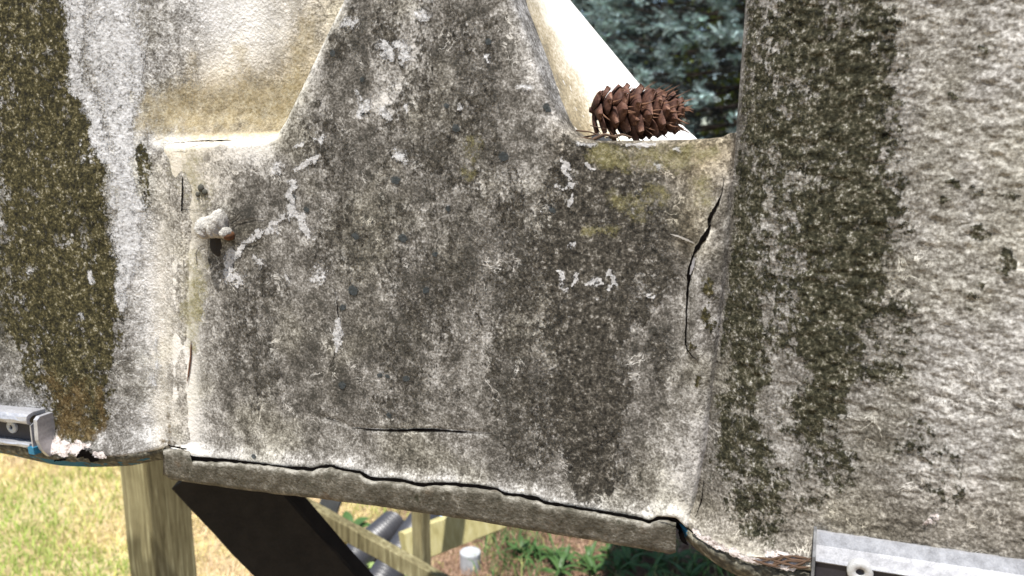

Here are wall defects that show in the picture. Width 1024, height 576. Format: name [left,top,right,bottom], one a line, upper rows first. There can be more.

leakage [867,1,912,144]
leakage [0,137,84,444]
leakage [74,168,123,325]
crack [671,178,724,367]
leakage [709,0,866,548]
leakage [866,158,915,250]
leakage [861,280,922,393]
spalling [0,436,166,467]
crack [327,418,512,435]
crack [163,444,704,545]